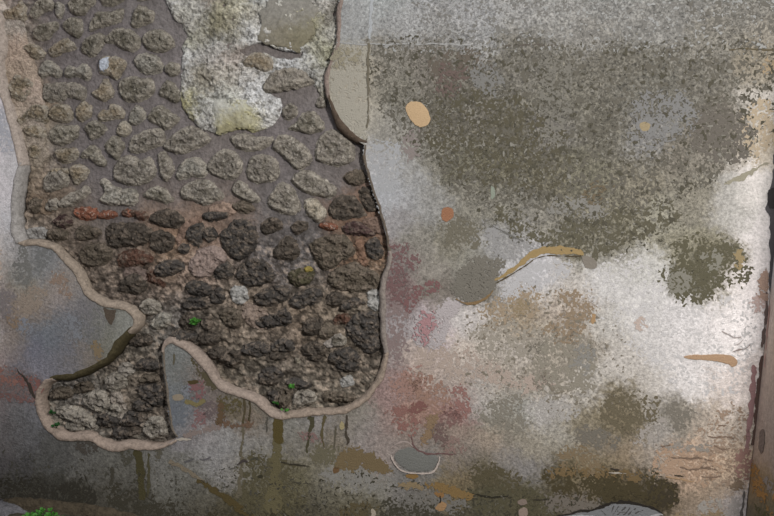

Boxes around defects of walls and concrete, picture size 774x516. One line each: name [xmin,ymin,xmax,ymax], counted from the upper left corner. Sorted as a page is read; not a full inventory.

water stain [466,61,505,98]
water stain [533,43,574,146]
water stain [620,86,774,167]
water stain [363,138,405,218]
water stain [546,195,610,225]
water stain [699,248,726,273]
water stain [666,268,696,299]
spalling [103,308,116,325]
water stain [305,415,344,453]
peeling [567,504,663,516]